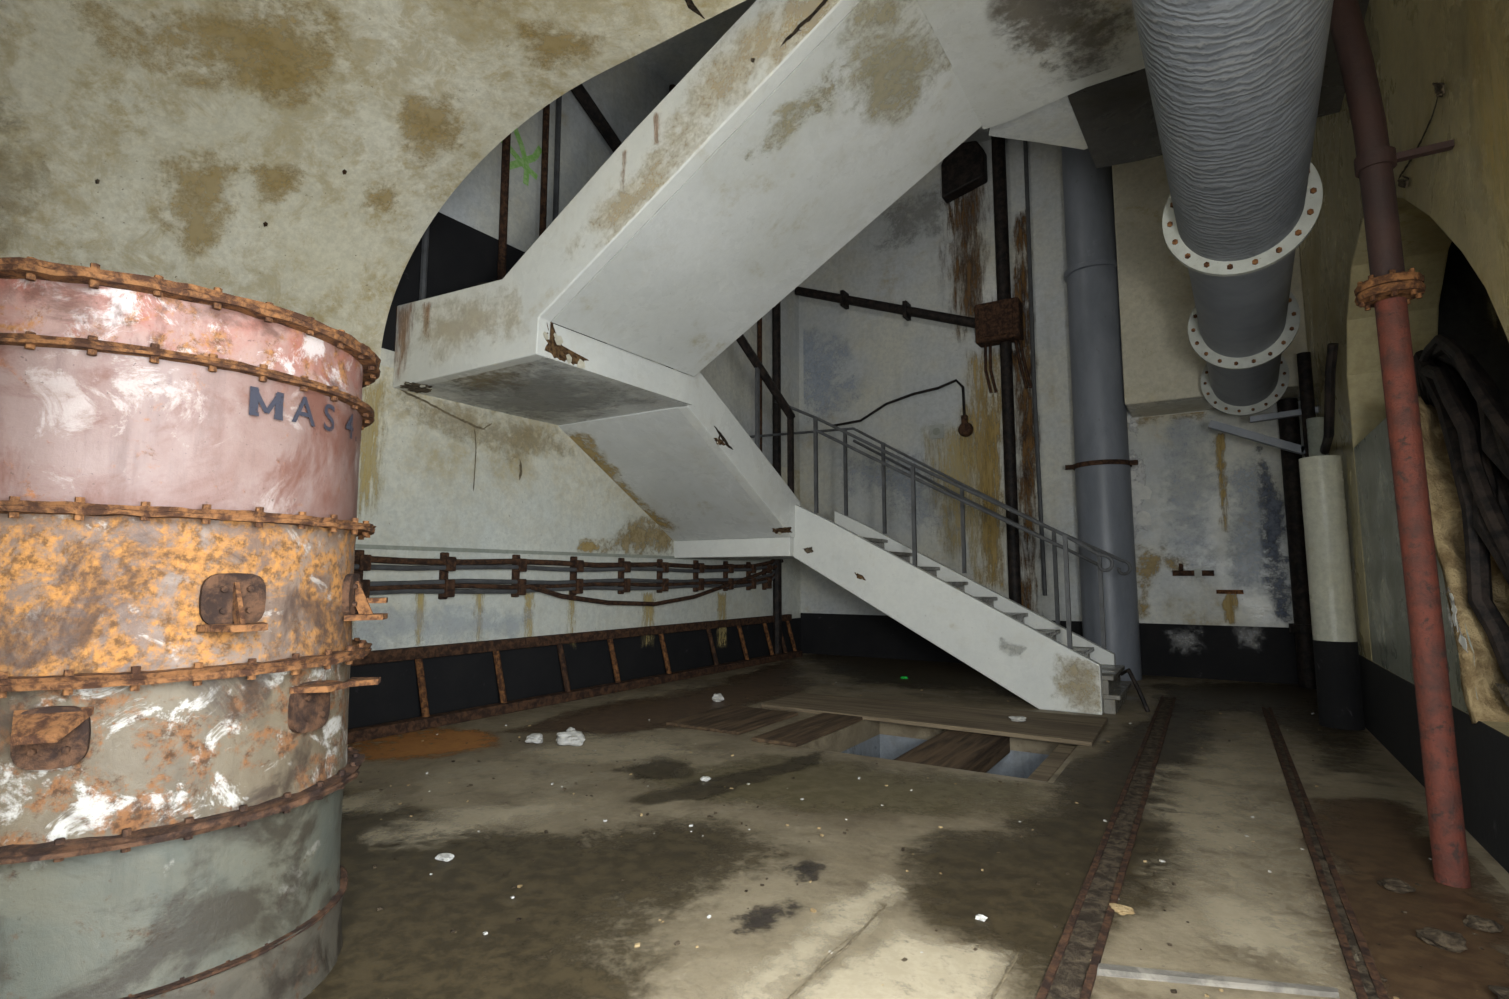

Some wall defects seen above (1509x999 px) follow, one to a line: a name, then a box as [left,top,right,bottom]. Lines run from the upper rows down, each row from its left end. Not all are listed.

crack [685,0,705,19]
crack [780,0,828,47]
leakage [993,0,1130,73]
leakage [164,155,297,253]
corrosion [948,186,985,335]
spalling [543,322,589,368]
corrosion [929,210,1041,612]
corrosion [1216,433,1228,529]
leakage [1257,447,1292,622]
corrosion [1222,594,1238,624]
leakage [303,683,1366,999]
leakage [1298,798,1509,999]